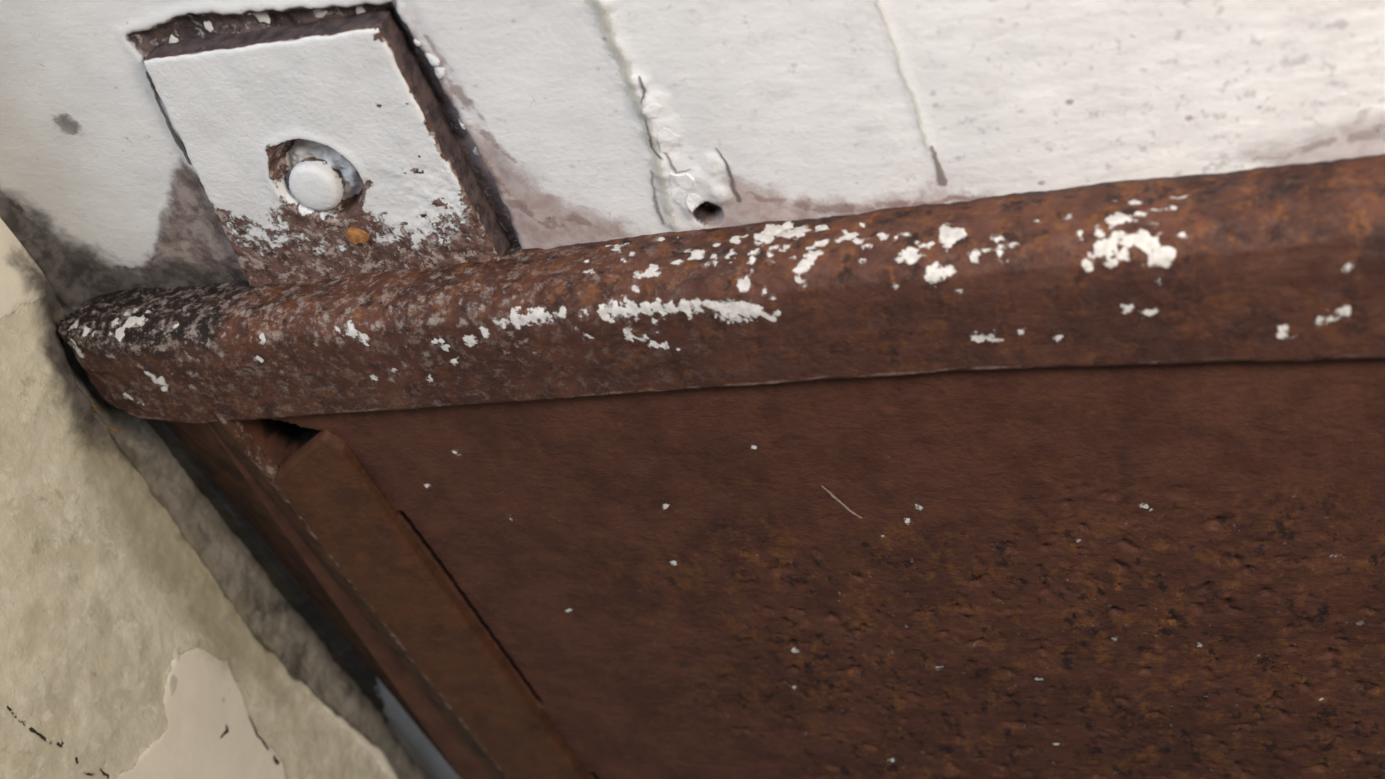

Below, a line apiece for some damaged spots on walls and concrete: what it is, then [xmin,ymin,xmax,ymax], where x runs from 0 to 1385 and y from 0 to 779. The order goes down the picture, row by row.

rust [145,165,247,280]
rust [345,227,370,244]
rust [438,78,627,249]
crack [586,0,741,225]
rust [707,184,869,229]
crack [876,0,947,186]
rust [1254,121,1385,163]
leakage [0,193,243,466]
peeling [0,299,432,779]